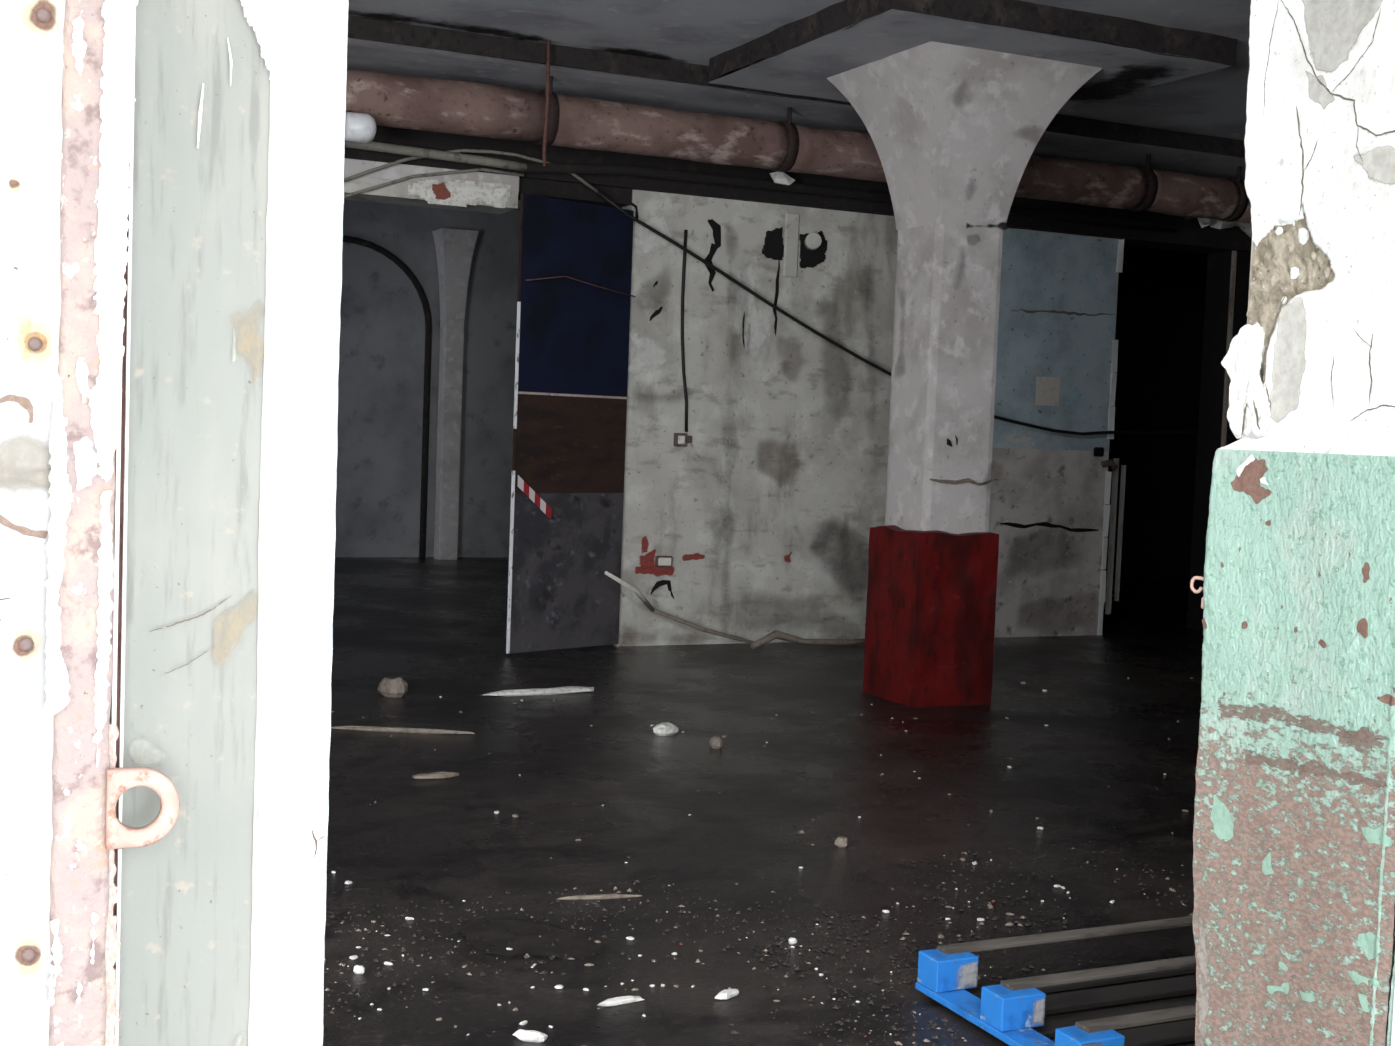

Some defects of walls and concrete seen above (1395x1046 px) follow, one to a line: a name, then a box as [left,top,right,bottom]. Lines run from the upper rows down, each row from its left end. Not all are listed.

rust [26,1,54,31]
crack [1263,0,1395,215]
peeling [1303,0,1382,109]
peeling [1355,146,1395,184]
rust [19,321,49,360]
crack [1262,295,1286,408]
spalling [1246,212,1335,422]
crack [1331,329,1395,421]
crack [999,522,1099,532]
rust [14,633,34,655]
peeling [1193,681,1395,1046]
crack [1385,905,1395,1046]